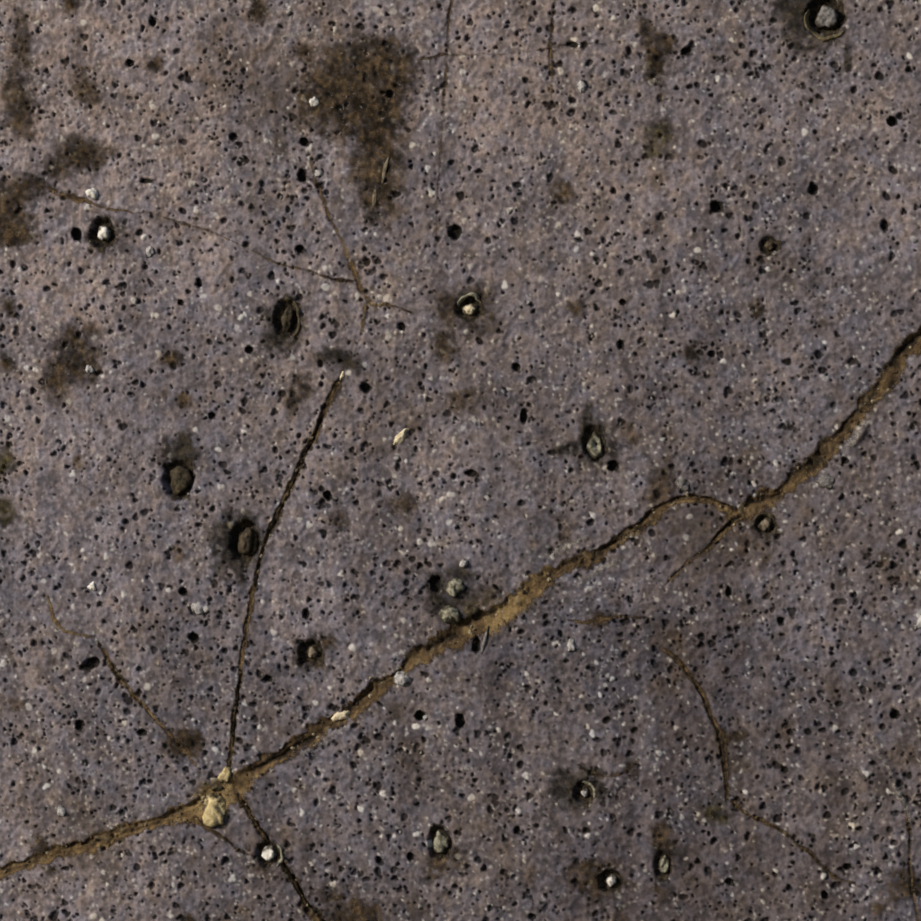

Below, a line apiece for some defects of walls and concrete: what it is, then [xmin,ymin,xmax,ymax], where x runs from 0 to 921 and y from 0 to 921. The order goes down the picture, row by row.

water stain [296,35,421,224]
crack [49,156,411,341]
crack [0,326,921,921]